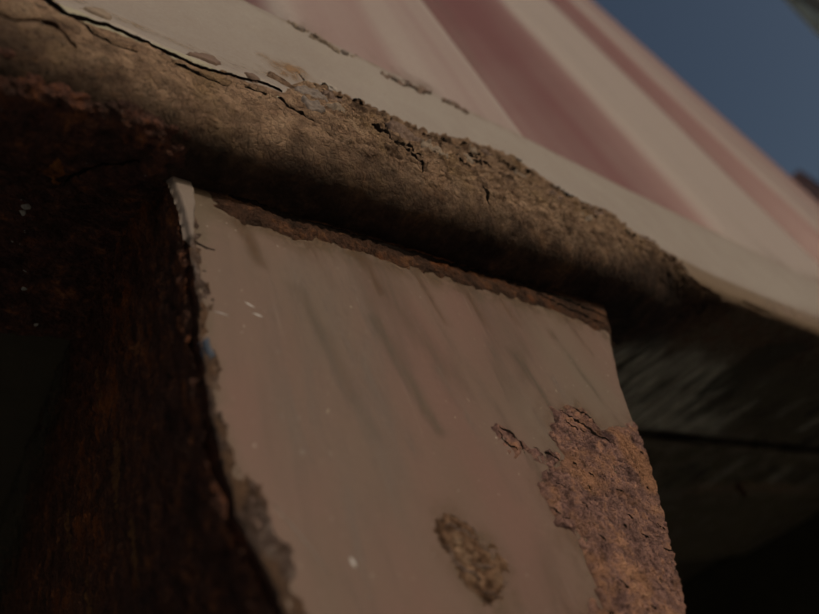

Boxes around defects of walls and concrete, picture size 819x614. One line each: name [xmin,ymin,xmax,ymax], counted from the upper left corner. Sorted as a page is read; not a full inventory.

peeling [287,20,357,58]
crack [0,0,314,121]
peeling [186,52,221,66]
peeling [380,71,432,95]
peeling [441,97,469,114]
crack [383,121,425,173]
corrosion [433,513,510,607]